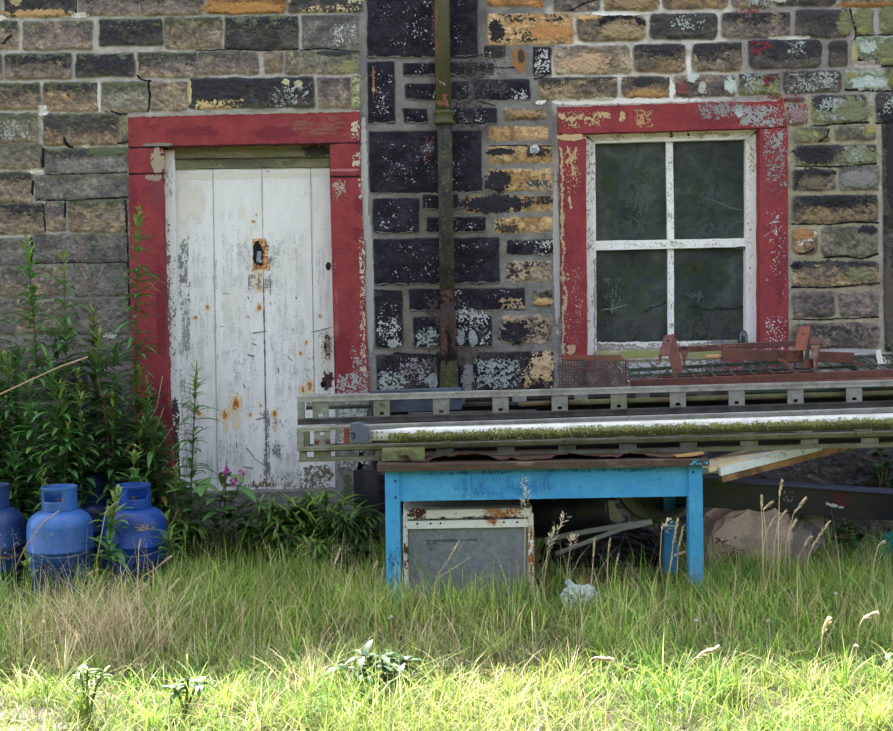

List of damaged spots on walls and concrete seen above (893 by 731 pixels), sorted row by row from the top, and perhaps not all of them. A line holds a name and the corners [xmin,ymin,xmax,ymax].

peeling [145,147,174,211]
peeling [155,202,339,490]
corrosion [218,391,278,434]
peeling [329,152,367,372]
peeling [498,88,777,389]
peeling [765,209,788,306]